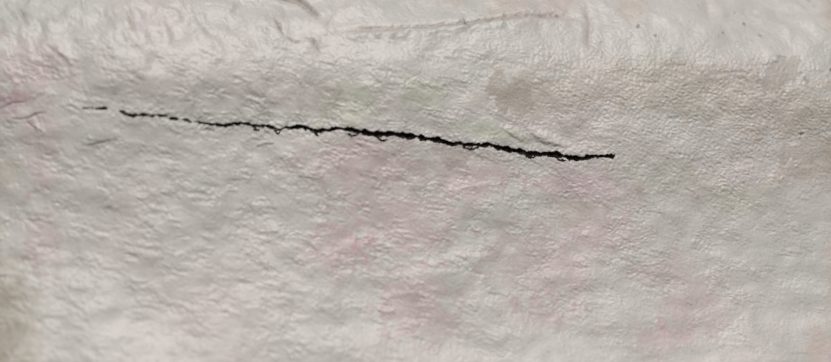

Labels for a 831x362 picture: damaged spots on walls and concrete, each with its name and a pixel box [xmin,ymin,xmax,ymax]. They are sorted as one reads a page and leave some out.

crack [80,106,615,162]